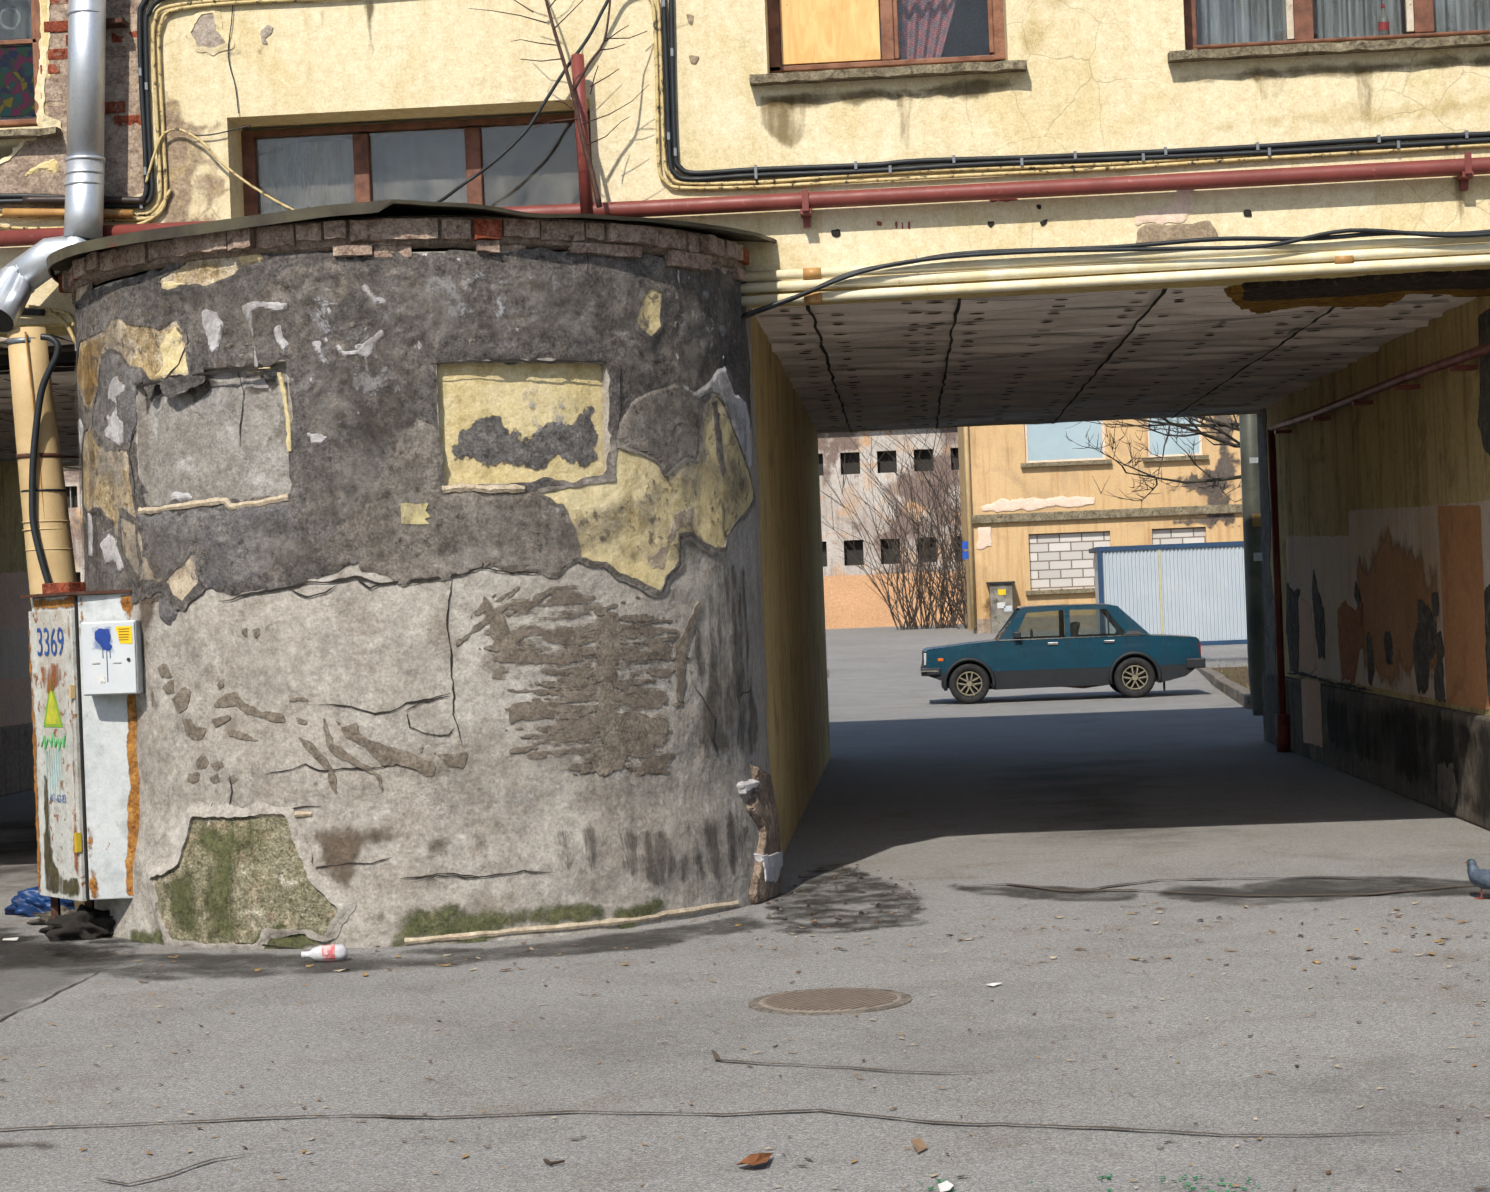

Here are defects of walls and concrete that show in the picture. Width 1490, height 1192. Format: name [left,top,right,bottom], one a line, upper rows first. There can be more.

flaking render [0,0,68,226]
flaking render [103,0,235,226]
flaking render [74,253,277,611]
peeling [1477,308,1490,456]
crack [223,562,539,749]
damp [450,567,758,776]
peeling [1413,592,1446,702]
spalling [141,663,356,949]
crack [211,764,418,809]
crack [315,857,551,883]
damp [584,827,595,869]
damp [620,805,749,884]